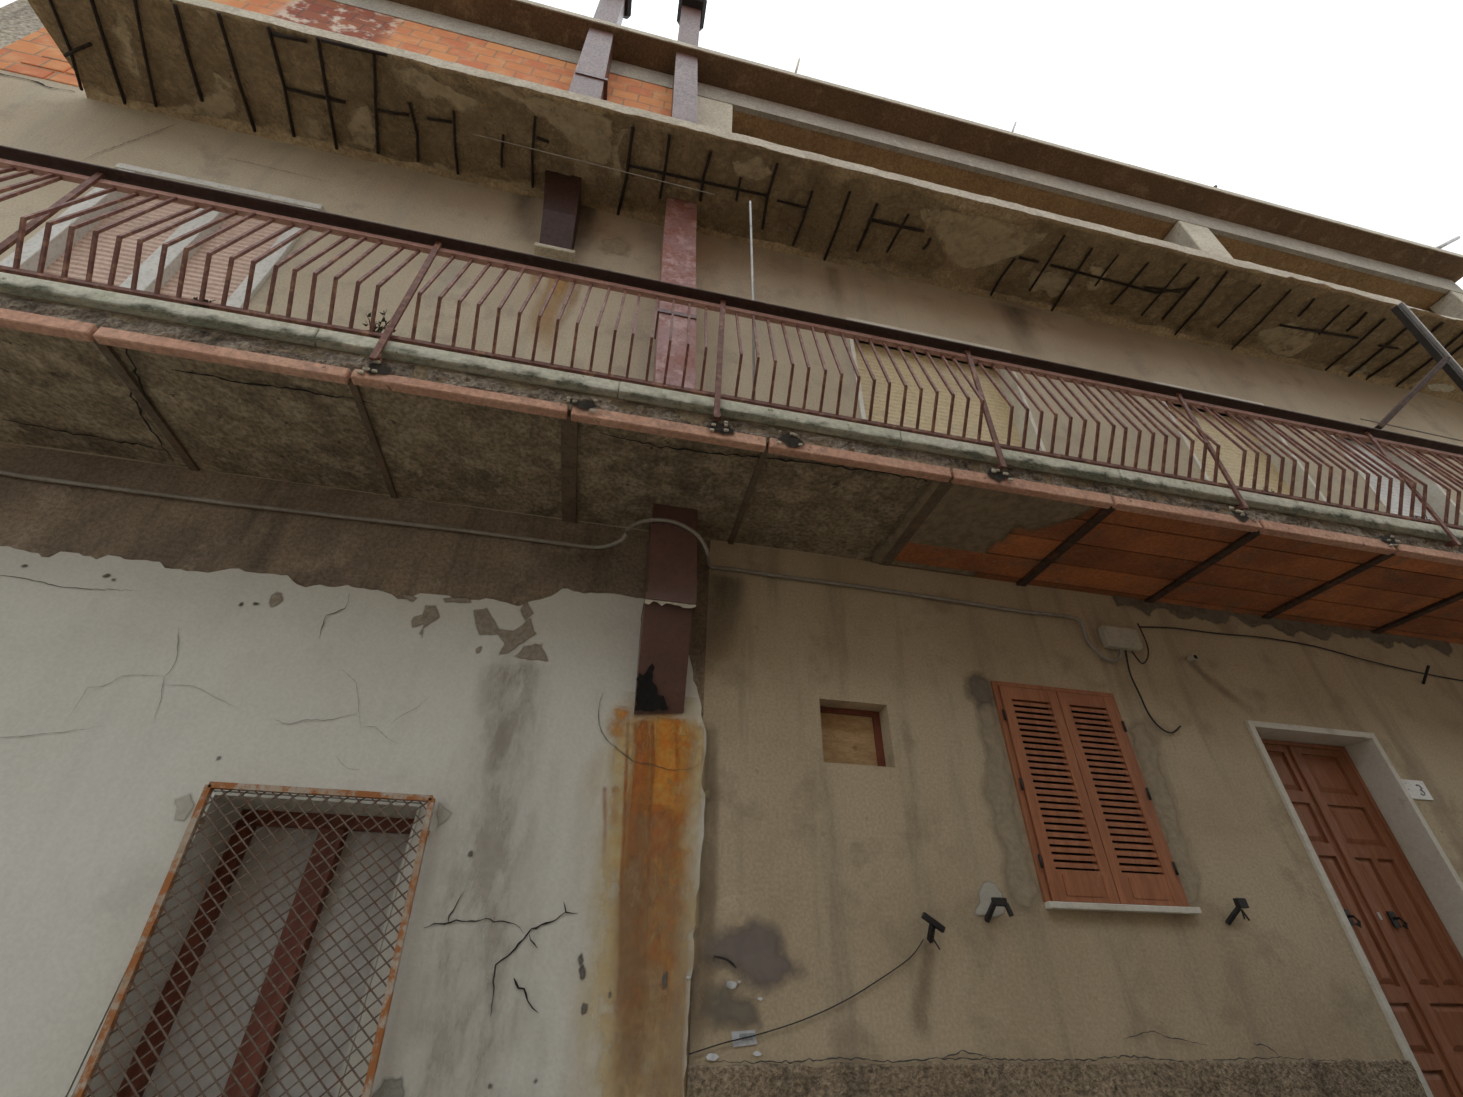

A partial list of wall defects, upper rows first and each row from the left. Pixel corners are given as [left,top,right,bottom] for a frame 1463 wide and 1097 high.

spalling [0,0,834,248]
spalling [980,222,1463,387]
spalling [357,360,392,375]
peeling [239,592,283,607]
peeling [402,594,548,661]
crack [0,628,232,738]
crack [277,671,430,742]
crack [425,893,576,1017]
rust [599,709,703,1097]